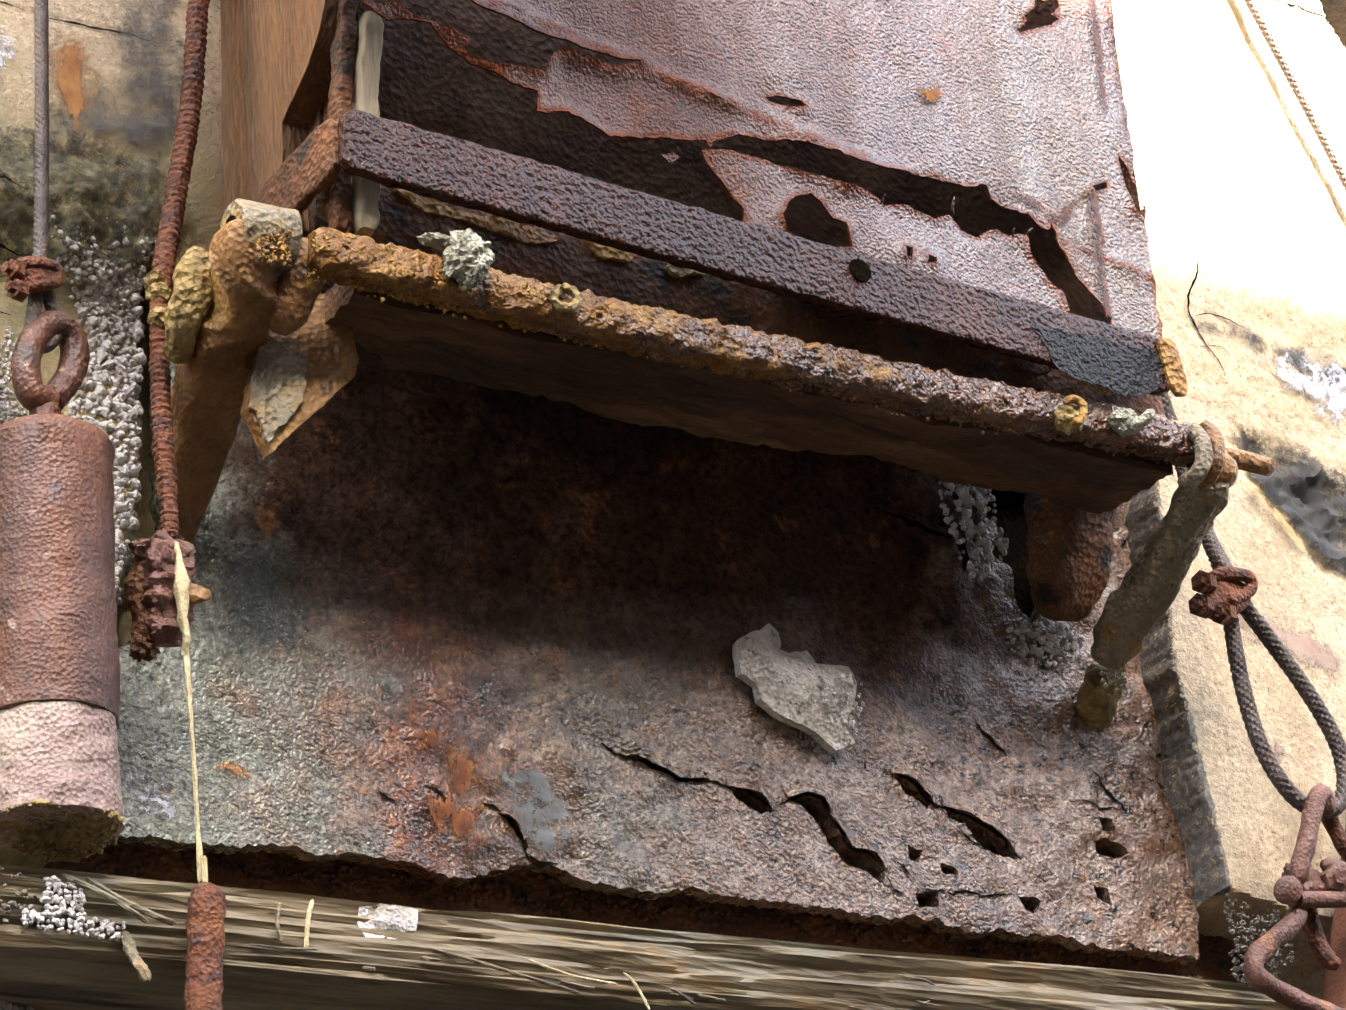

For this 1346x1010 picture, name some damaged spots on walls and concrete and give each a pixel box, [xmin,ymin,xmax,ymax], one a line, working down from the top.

leakage [0,28,15,67]
crack [0,1,161,44]
rust [661,153,680,164]
spalling [1240,429,1346,575]
rust [409,704,491,863]
crack [601,742,1025,897]